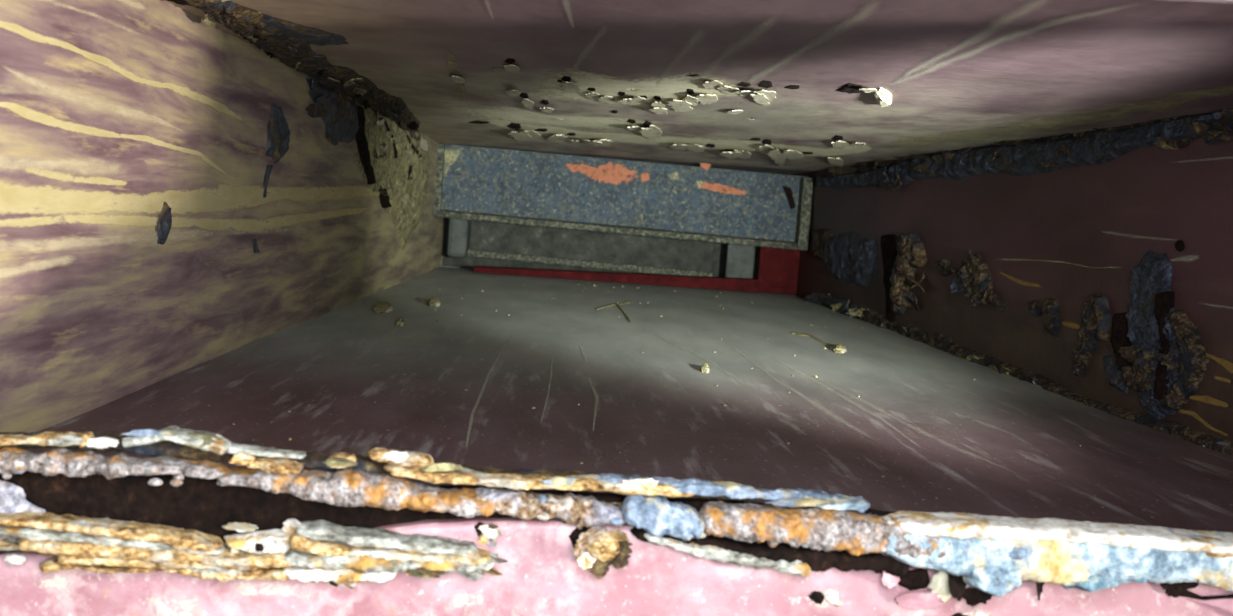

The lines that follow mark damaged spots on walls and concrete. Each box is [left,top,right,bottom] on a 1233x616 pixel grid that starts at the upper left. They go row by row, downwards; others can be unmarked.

rust [0,21,243,120]
rust [0,70,430,278]
spalling [263,103,291,198]
spalling [161,0,420,132]
peeling [505,90,554,113]
peeling [507,123,613,147]
peeling [557,73,813,166]
peeling [828,135,865,167]
spalling [837,83,877,94]
spalling [881,233,1007,322]
spalling [1072,240,1209,419]
rust [0,426,1233,616]